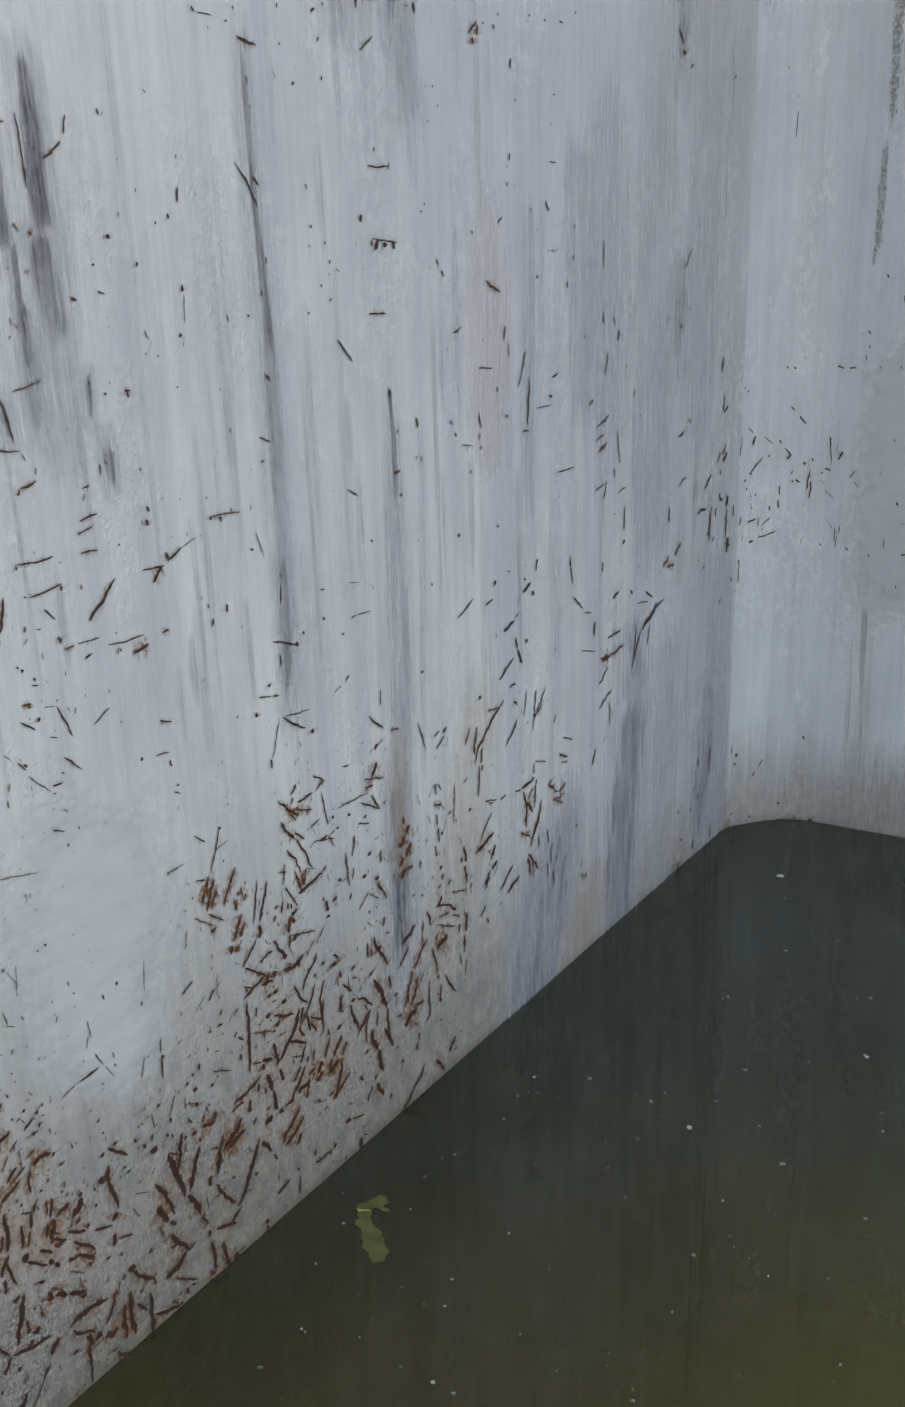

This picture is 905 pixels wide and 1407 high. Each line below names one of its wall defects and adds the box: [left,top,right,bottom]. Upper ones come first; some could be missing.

damp [0,57,66,428]
damp [103,446,115,482]
corrosion [143,504,252,582]
corrosion [698,425,843,603]
corrosion [0,556,664,1407]